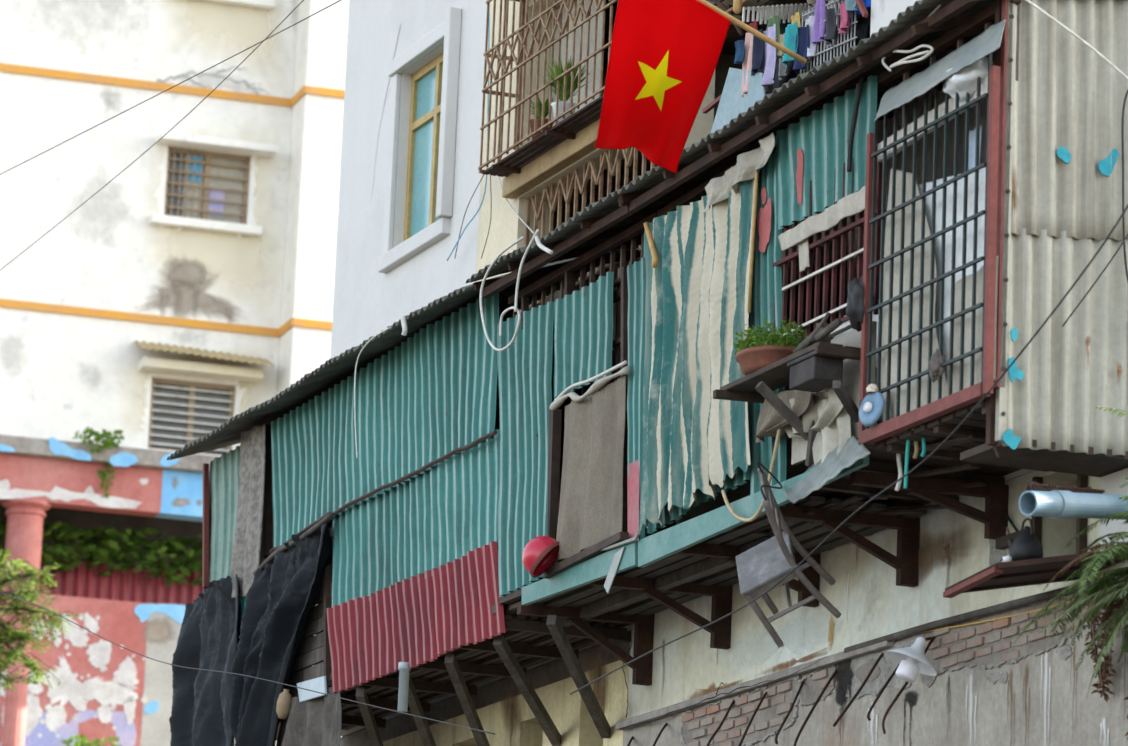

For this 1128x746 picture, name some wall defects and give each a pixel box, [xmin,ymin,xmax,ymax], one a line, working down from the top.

crack [157,66,269,95]
damp [153,262,234,318]
peeling [0,479,142,509]
peeling [134,604,185,624]
peeling [24,612,159,746]
damp [835,659,853,736]
flaking render [678,590,1106,746]
damp [903,691,917,746]
damp [966,675,977,741]
damp [1007,652,1051,735]